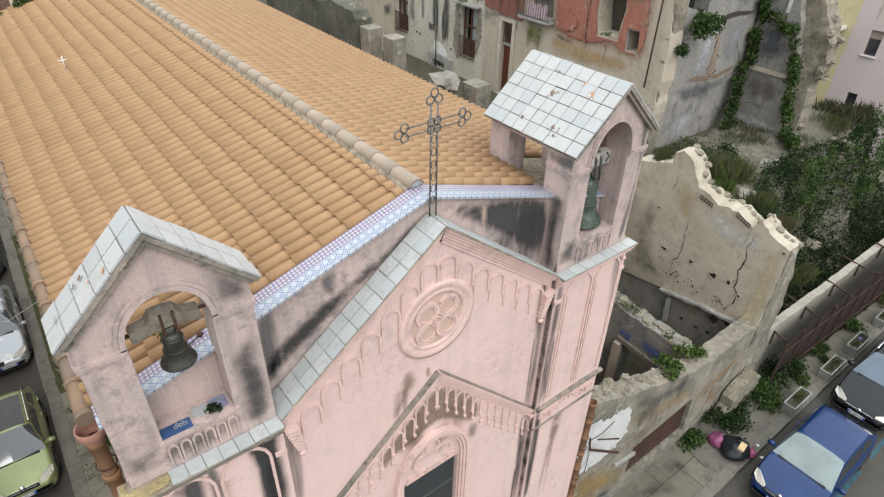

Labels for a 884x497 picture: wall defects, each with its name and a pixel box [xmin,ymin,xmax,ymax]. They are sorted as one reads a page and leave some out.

crack [725,233,757,309]
damp [458,198,561,496]
damp [383,390,477,465]
flaking render [577,406,632,474]